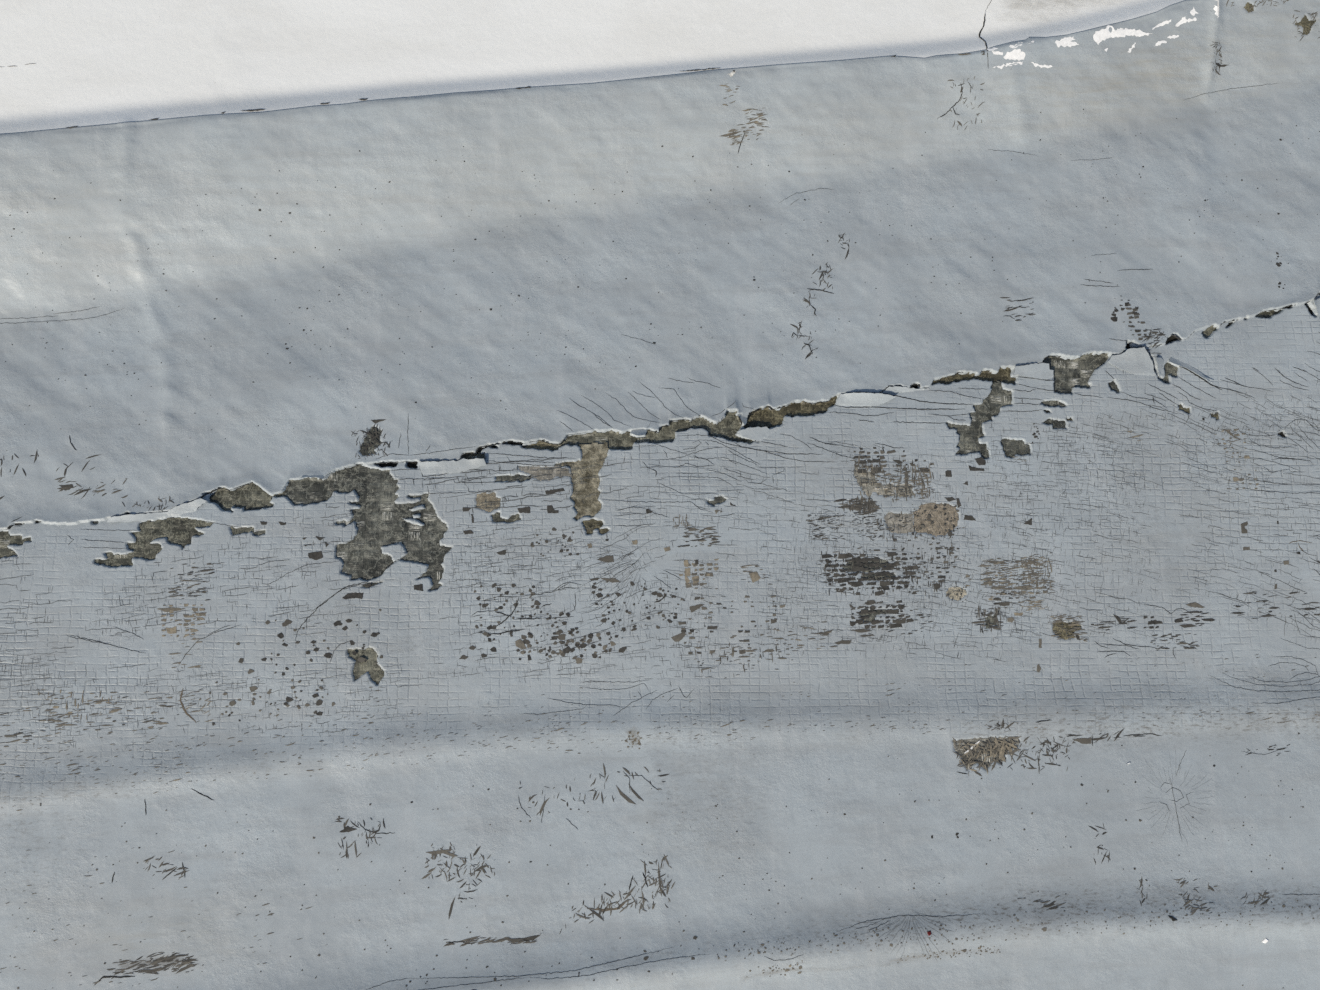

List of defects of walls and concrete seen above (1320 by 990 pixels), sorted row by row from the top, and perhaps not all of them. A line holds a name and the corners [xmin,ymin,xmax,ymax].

peeling [958,41,1053,69]
peeling [1055,0,1320,53]
peeling [1179,404,1320,494]
crack [0,288,1320,749]
peeling [0,381,1215,747]
peeling [1232,552,1320,619]
peeling [952,720,1124,776]